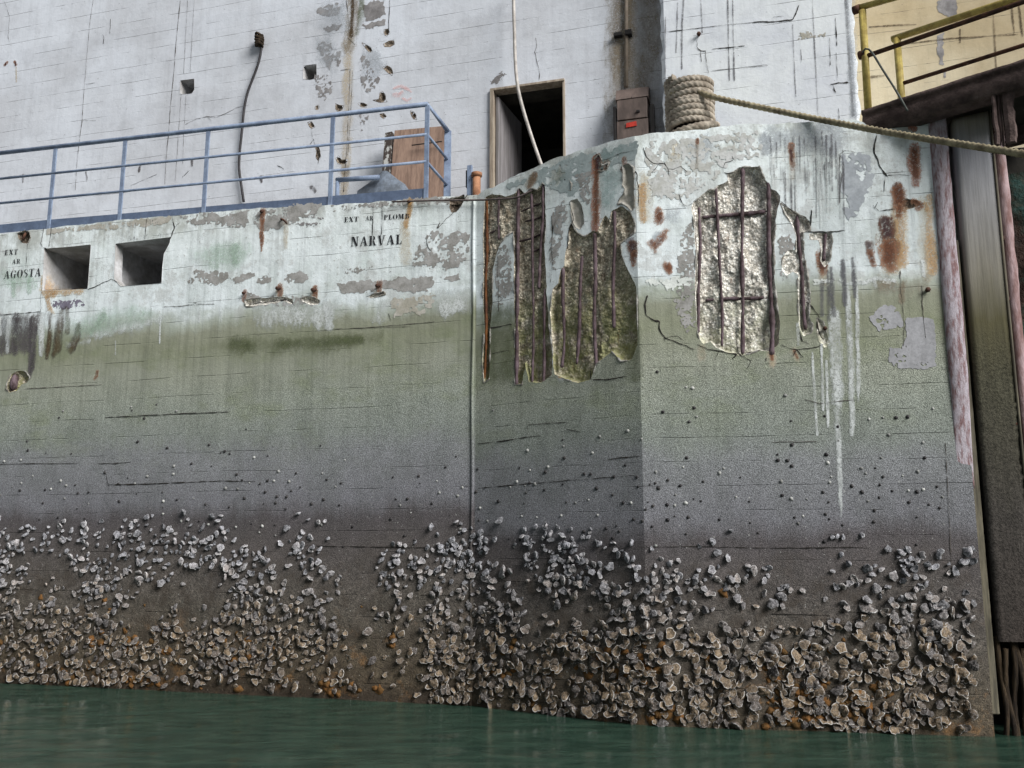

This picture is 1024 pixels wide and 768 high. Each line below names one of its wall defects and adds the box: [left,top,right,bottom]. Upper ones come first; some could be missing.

peeling [308,3,344,129]
peeling [359,0,395,131]
rust [590,153,626,232]
crack [839,136,908,211]
rust [866,126,933,273]
spalling [46,130,897,385]
rust [926,233,938,275]
spalling [5,371,31,392]
damp [0,308,163,377]
crack [644,295,824,367]
damp [812,257,904,510]
peeling [869,305,937,369]